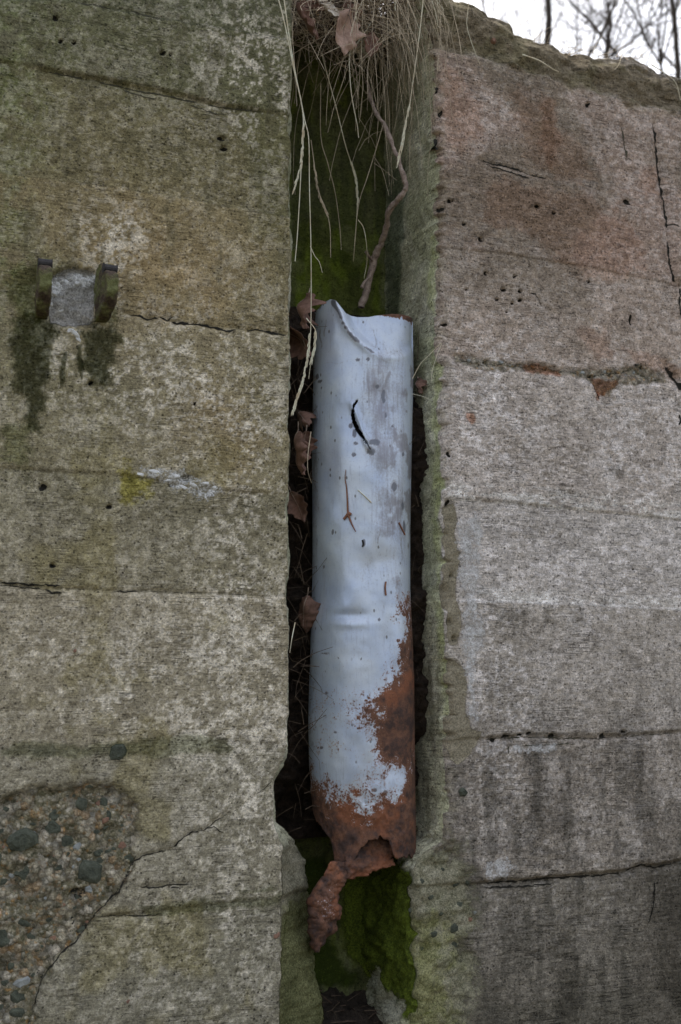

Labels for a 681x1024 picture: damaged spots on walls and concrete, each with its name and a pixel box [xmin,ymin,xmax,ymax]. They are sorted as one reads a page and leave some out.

crack [652,126,681,315]
water stain [10,314,122,430]
crack [134,315,284,336]
spalling [0,782,139,1024]
crack [28,809,238,1024]
corrosion [344,836,396,880]